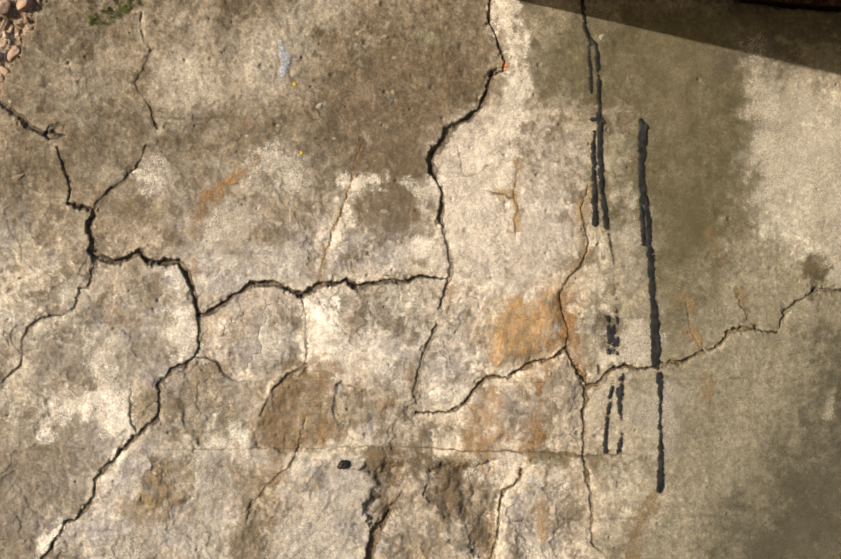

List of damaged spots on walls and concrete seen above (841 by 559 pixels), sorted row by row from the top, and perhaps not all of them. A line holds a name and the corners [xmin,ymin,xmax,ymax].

spalling [0,0,43,93]
efflorescence [134,162,165,194]
corrosion [190,164,245,236]
efflorescence [229,142,307,194]
crack [493,165,519,230]
corrosion [497,189,521,233]
water stain [317,0,841,311]
crack [0,0,504,559]
corrosion [488,282,586,376]
water stain [592,315,651,372]
crack [412,213,841,558]
water stain [726,321,841,559]